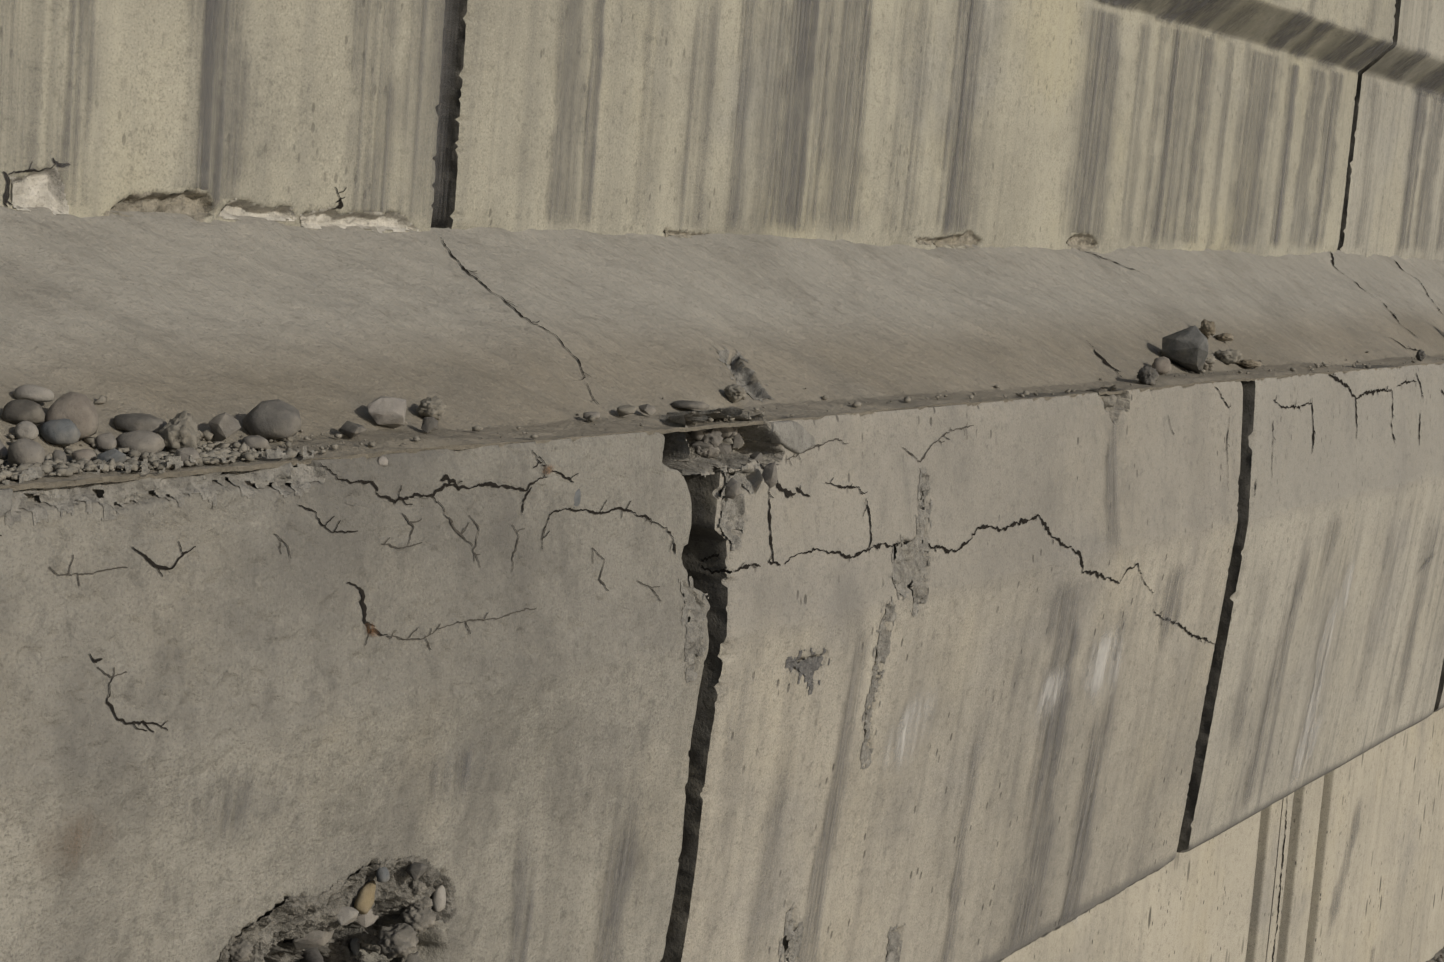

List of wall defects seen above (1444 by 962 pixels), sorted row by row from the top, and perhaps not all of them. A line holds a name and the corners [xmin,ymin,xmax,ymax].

damp [197,0,237,198]
damp [1072,0,1226,233]
damp [1233,11,1332,244]
damp [1310,31,1427,243]
damp [1401,70,1444,248]
crack [441,238,600,405]
crack [49,542,196,586]
crack [299,438,1218,650]
crack [90,654,168,732]
damp [1032,594,1077,877]
damp [1091,640,1110,689]
spalling [218,855,457,962]